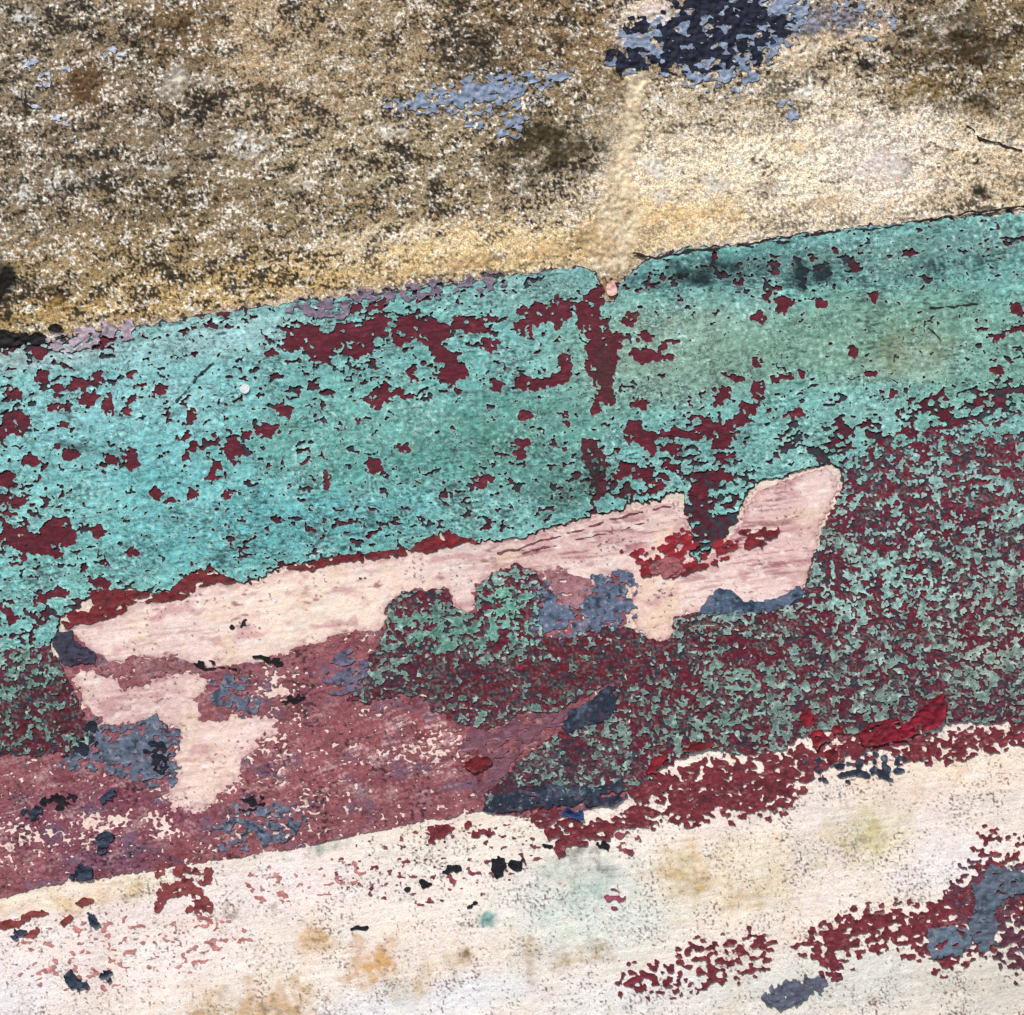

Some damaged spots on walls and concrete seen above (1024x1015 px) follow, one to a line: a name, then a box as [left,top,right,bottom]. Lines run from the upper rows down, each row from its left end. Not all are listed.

peeling [604,0,816,99]
peeling [382,65,574,140]
peeling [32,319,169,428]
peeling [265,270,507,392]
peeling [489,284,680,416]
peeling [749,295,795,325]
peeling [992,302,1024,343]
flaking render [0,357,1024,906]
peeling [949,824,1024,927]
peeling [13,897,253,993]
peeling [615,926,778,1001]
peeling [931,951,1019,985]